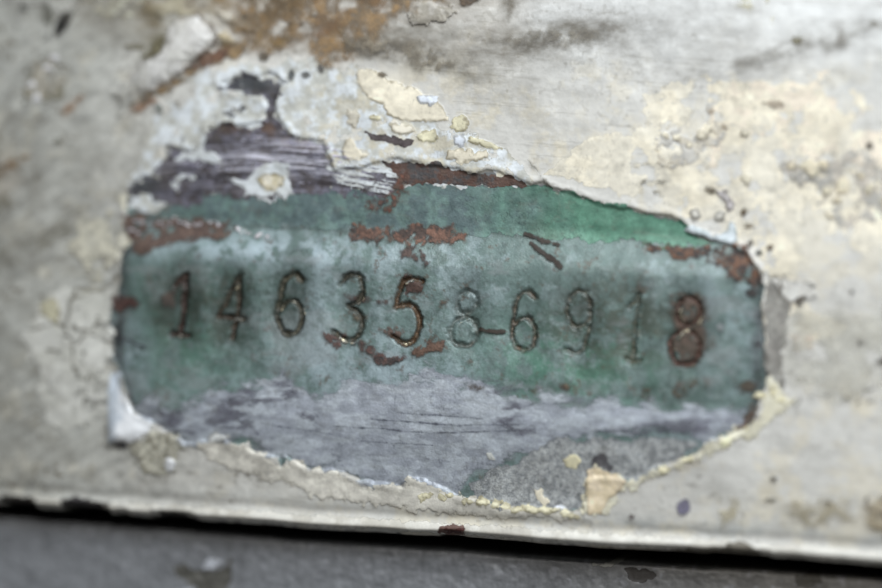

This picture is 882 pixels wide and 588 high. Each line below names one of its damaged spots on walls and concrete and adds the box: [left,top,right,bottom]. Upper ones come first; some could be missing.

rust [132,0,411,113]
rust [365,174,406,212]
rust [121,211,270,255]
rust [349,222,467,266]
rust [646,242,763,287]
peeling [20,53,882,523]
crack [28,286,114,428]
peeling [437,523,466,535]